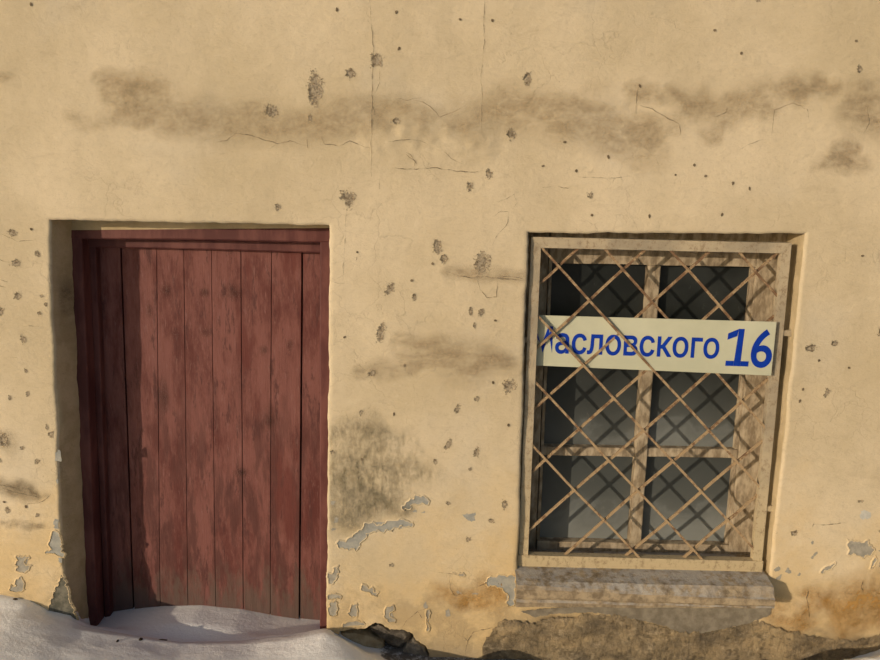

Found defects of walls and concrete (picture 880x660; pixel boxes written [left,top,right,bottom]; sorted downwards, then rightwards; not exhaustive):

crack [225,12,478,185]
peeling [331,494,431,552]
peeling [846,538,880,570]
spalling [326,565,436,657]
peeling [456,573,516,608]
flaking render [482,613,880,660]